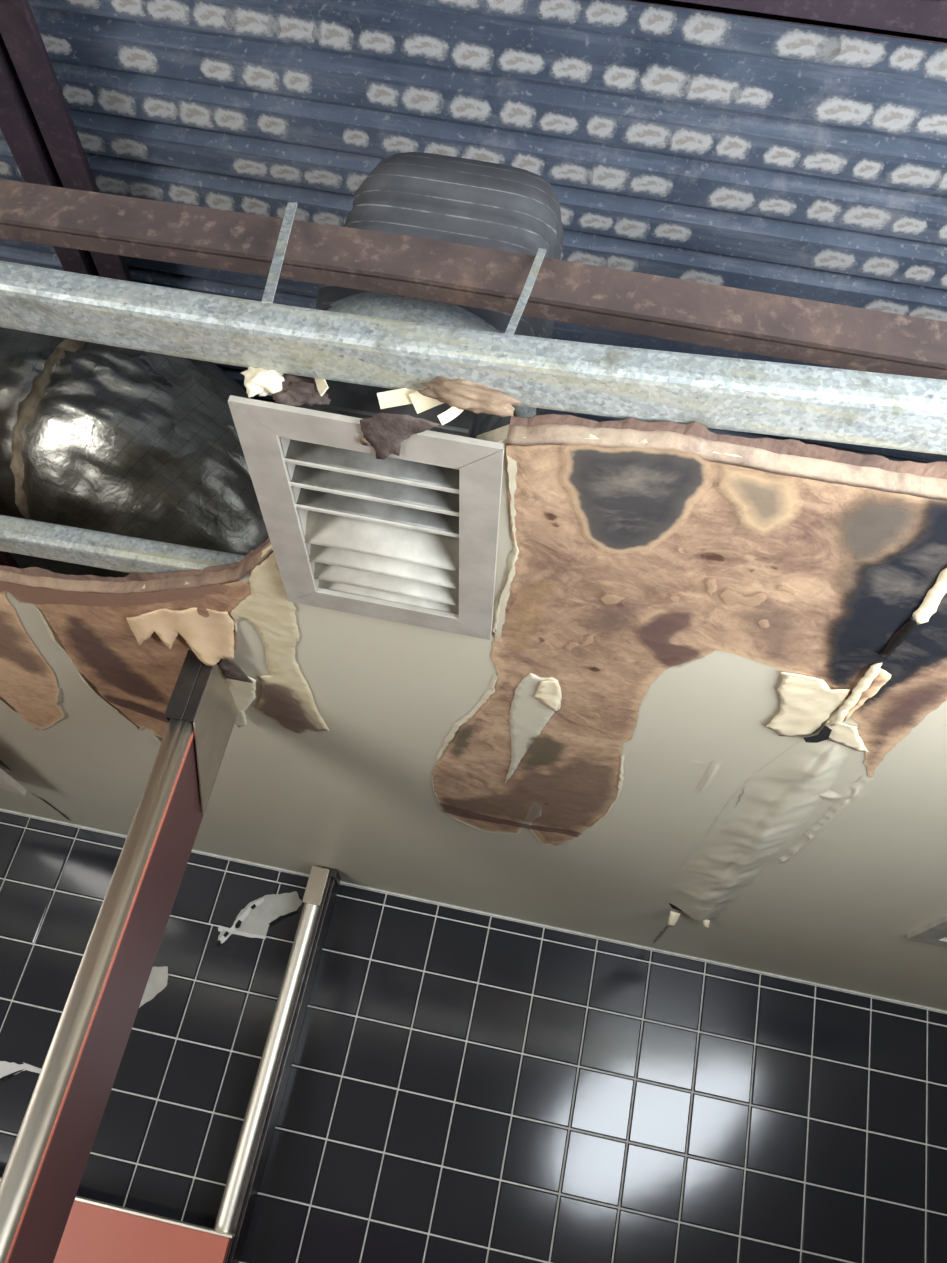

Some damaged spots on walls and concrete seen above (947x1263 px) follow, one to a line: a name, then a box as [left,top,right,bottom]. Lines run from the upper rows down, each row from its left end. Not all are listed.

corrosion [63,85,289,135]
corrosion [95,175,346,226]
corrosion [233,158,367,191]
corrosion [343,129,673,197]
corrosion [560,207,692,241]
corrosion [709,187,947,240]
corrosion [813,249,947,286]
corrosion [865,300,947,322]
water stain [563,445,800,553]
peeling [0,538,273,744]
peeling [430,414,947,846]
water stain [829,499,947,745]